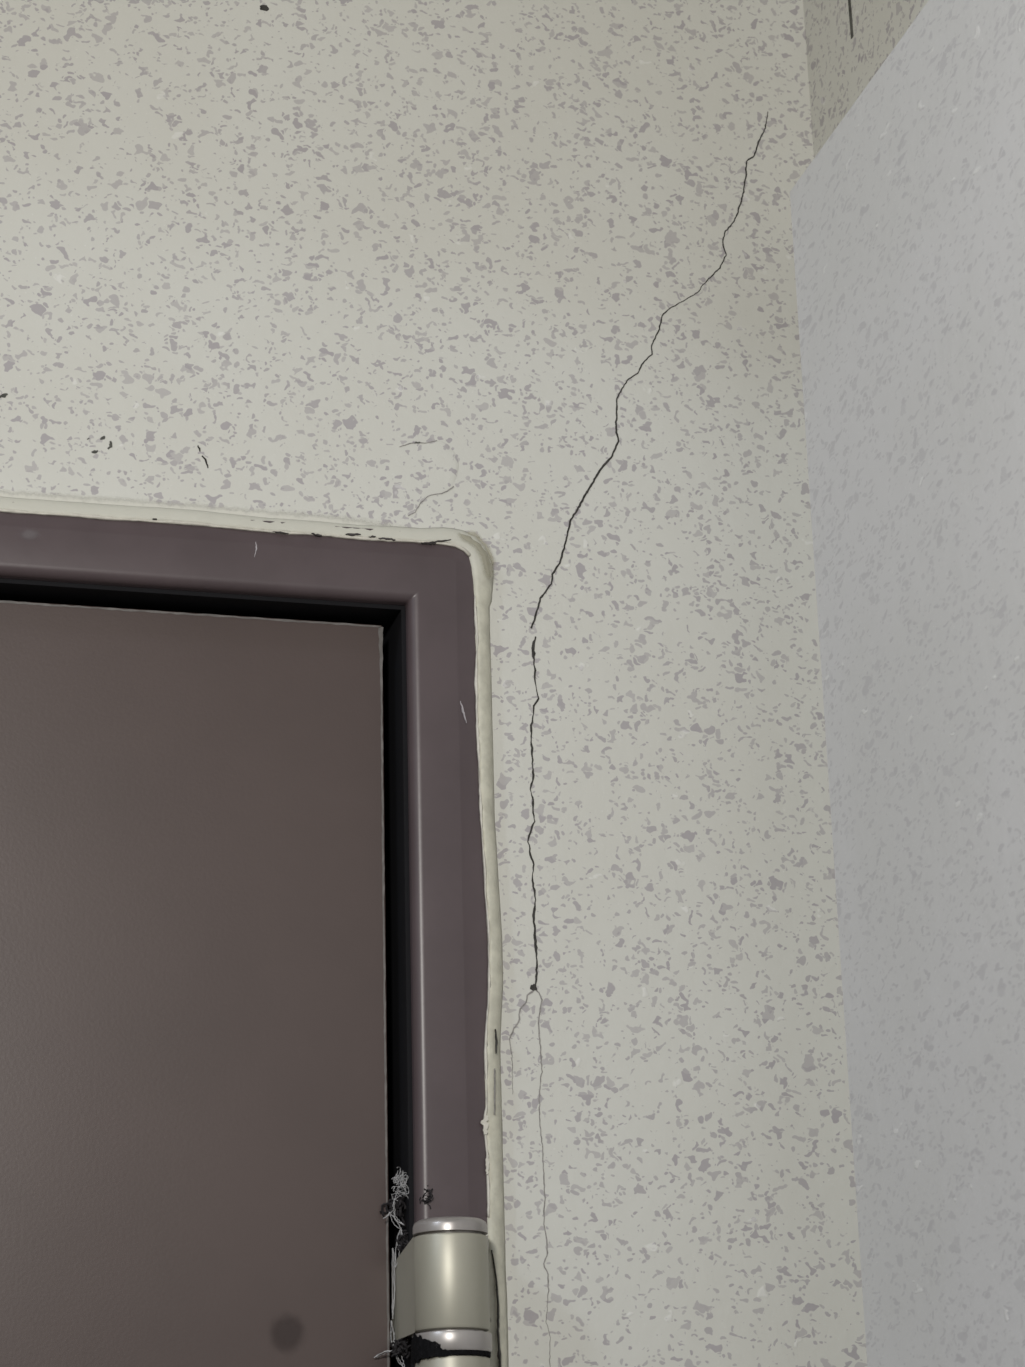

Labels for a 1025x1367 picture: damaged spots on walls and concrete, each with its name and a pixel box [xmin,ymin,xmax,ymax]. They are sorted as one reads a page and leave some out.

crack [491,1250,501,1367]
crack [494,112,768,1364]